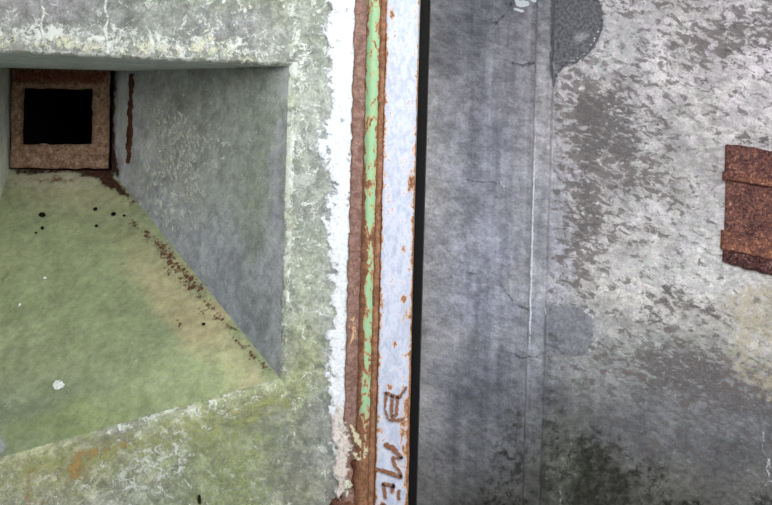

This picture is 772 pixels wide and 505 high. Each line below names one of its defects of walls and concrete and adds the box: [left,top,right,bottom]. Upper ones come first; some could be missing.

spalling [549,0,609,86]
rust [15,70,136,205]
rust [129,219,272,376]
water stain [561,431,638,505]